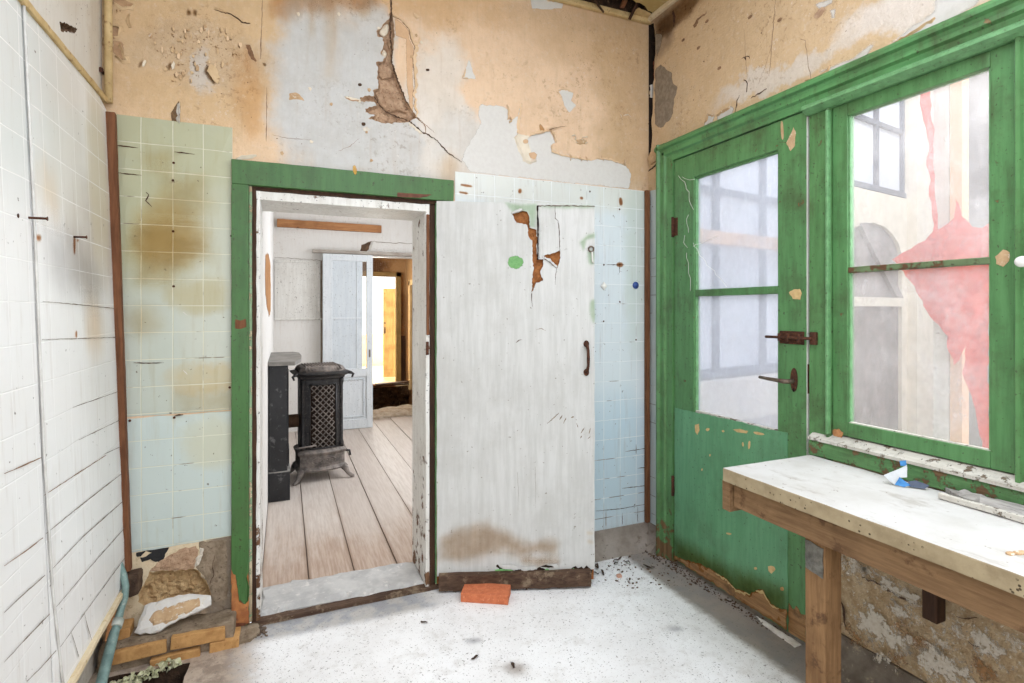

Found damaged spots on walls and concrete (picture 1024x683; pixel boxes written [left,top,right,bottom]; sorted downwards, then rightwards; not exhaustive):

peeling [102,0,146,67]
peeling [205,64,220,84]
flaking render [345,0,429,131]
flaking render [654,34,677,128]
crack [405,101,461,162]
peeling [462,103,631,189]
flaking render [138,540,249,623]
peeling [674,556,806,643]
flaking render [841,554,1024,683]